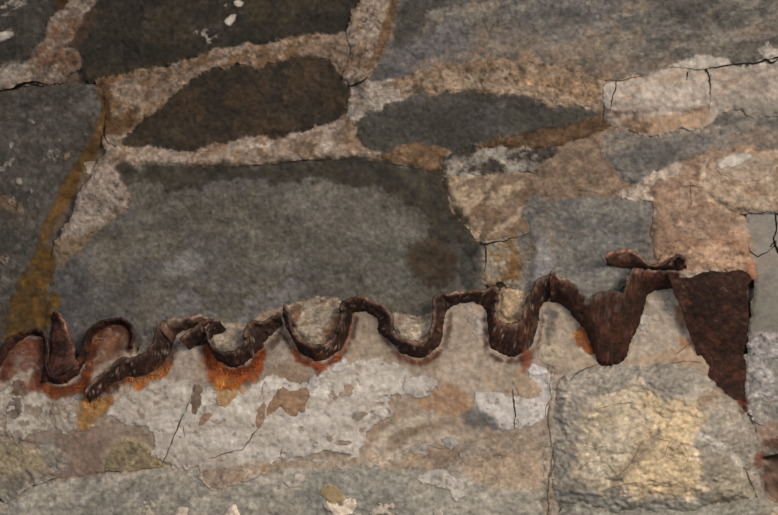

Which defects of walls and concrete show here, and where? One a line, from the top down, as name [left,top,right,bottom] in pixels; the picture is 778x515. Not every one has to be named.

crack [670,56,778,109]
crack [744,209,778,257]
rust [0,324,174,431]
rust [203,313,359,391]
rust [483,318,531,366]
rust [573,327,593,353]